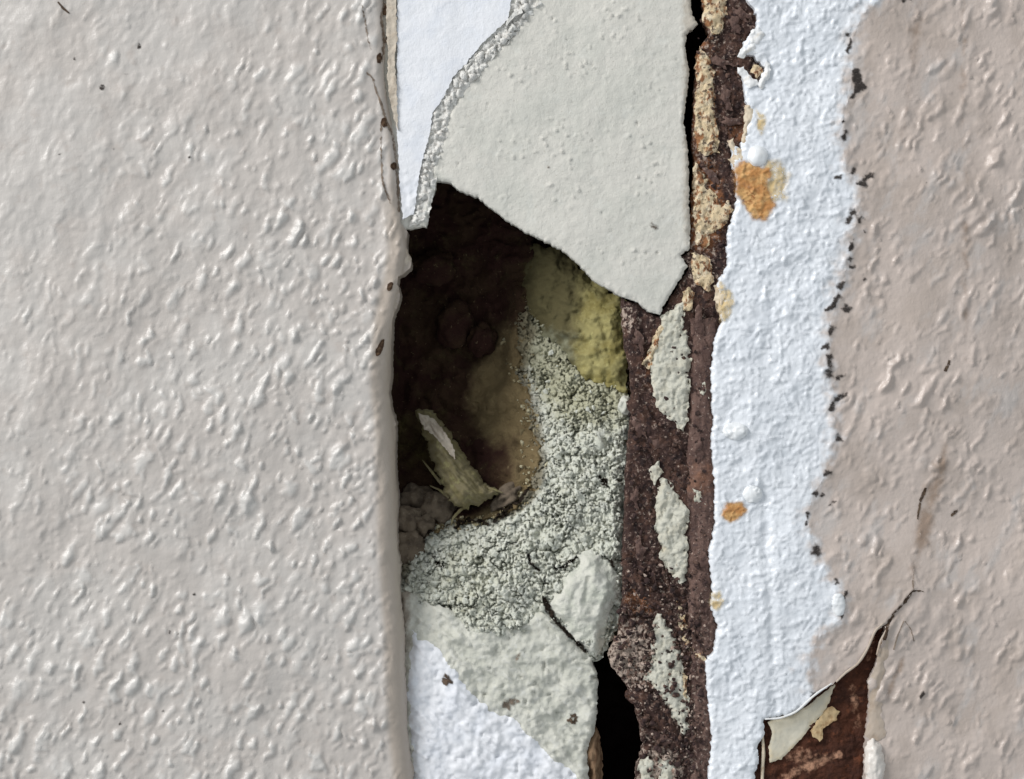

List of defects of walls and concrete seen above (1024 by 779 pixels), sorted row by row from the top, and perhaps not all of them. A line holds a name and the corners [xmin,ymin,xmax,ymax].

rust [728,6,753,34]
peeling [737,27,771,89]
rust [720,85,743,126]
peeling [727,105,753,167]
rust [733,161,785,220]
rust [719,282,733,321]
spalling [376,183,631,662]
rust [722,502,747,522]
rust [696,549,709,571]